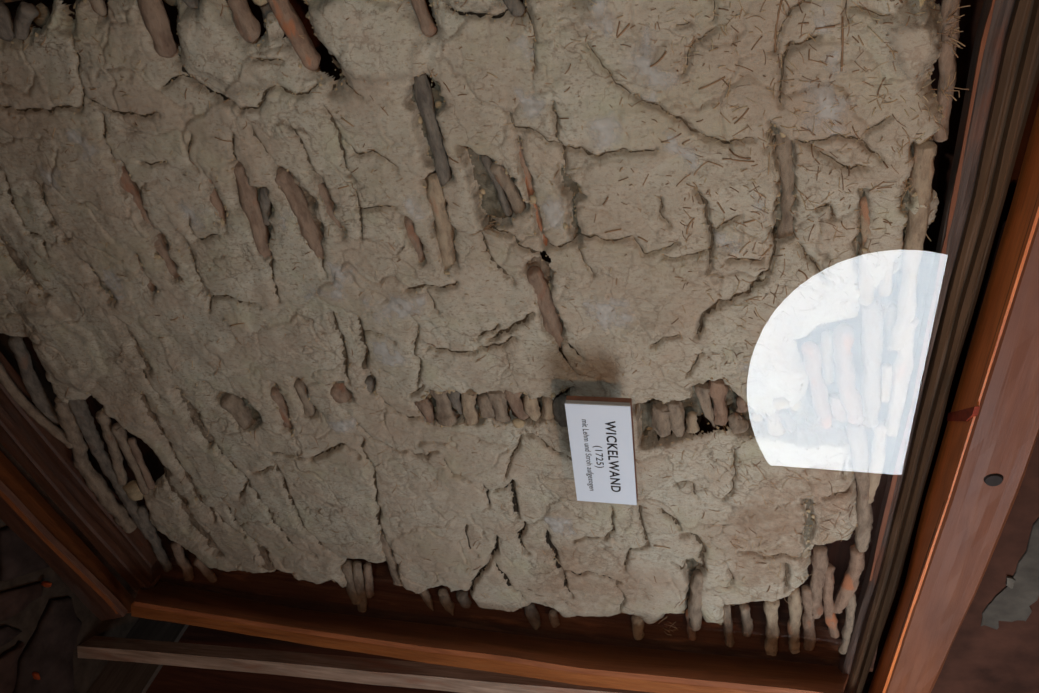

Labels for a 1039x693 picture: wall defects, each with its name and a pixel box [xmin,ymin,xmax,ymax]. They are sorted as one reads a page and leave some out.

crack [163,54,397,168]
crack [588,44,890,170]
spalling [467,147,537,219]
spalling [0,236,43,290]
crack [482,191,827,372]
crack [333,311,530,418]
spalling [507,387,570,428]
spalling [640,399,655,436]
spalling [681,385,848,433]
crack [217,424,452,545]
crack [465,436,734,610]
spalling [686,558,699,596]